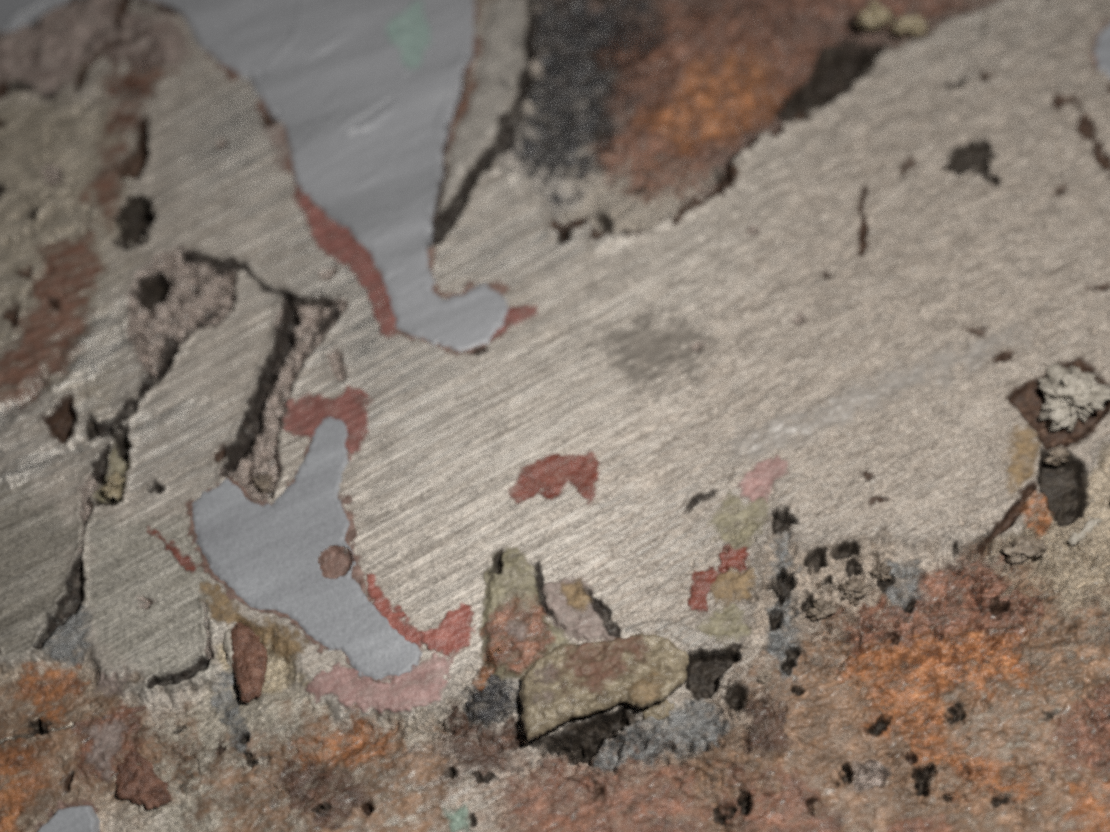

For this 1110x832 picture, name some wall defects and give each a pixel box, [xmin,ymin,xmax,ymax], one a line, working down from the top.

peeling [0,0,70,35]
spalling [117,118,150,180]
spalling [112,194,157,250]
peeling [148,0,538,355]
crack [430,0,538,246]
corrosion [497,0,996,239]
peeling [37,773,102,832]
crack [33,390,146,649]
peeling [126,246,473,713]
corrosion [0,444,1110,832]
peeling [518,633,689,741]
hole [723,683,748,711]